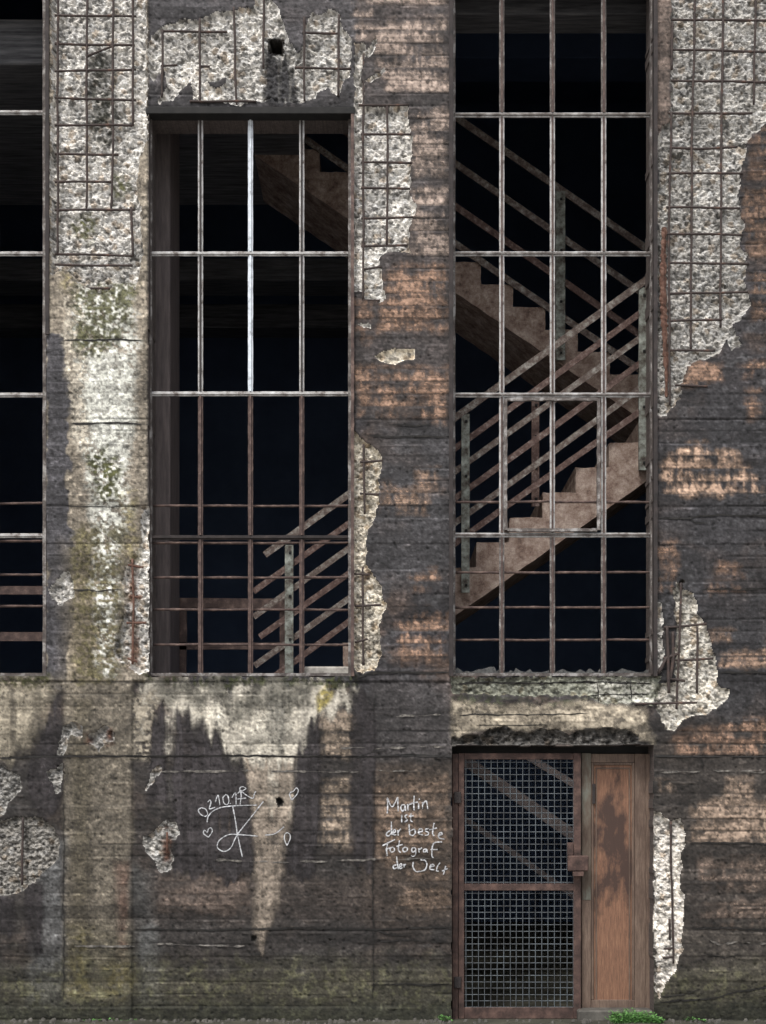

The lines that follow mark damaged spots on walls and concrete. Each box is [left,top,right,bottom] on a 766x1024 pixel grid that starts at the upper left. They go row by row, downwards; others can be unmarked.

spalling [49,0,449,330]
spalling [657,0,766,417]
leakage [64,284,135,675]
spalling [354,431,436,674]
peeling [354,348,448,418]
peeling [399,617,447,661]
spalling [450,547,766,754]
spalling [0,764,60,896]
spalling [142,820,180,873]
spalling [652,778,766,999]